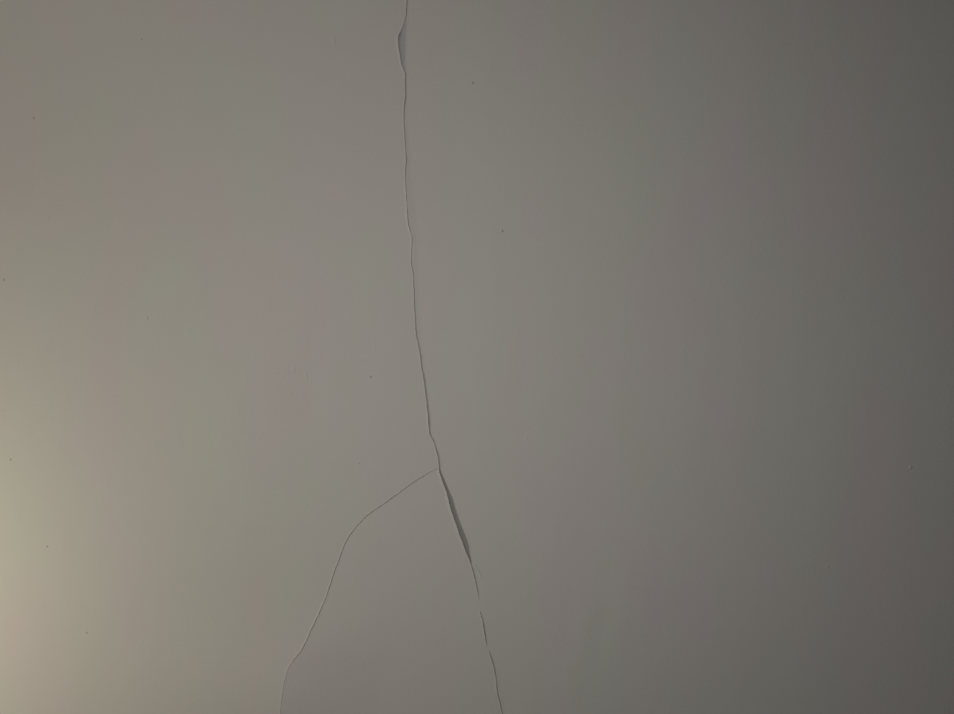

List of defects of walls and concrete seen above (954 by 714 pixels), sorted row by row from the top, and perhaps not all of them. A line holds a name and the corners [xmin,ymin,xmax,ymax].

crack [279,73,442,714]
crack [469,562,506,714]